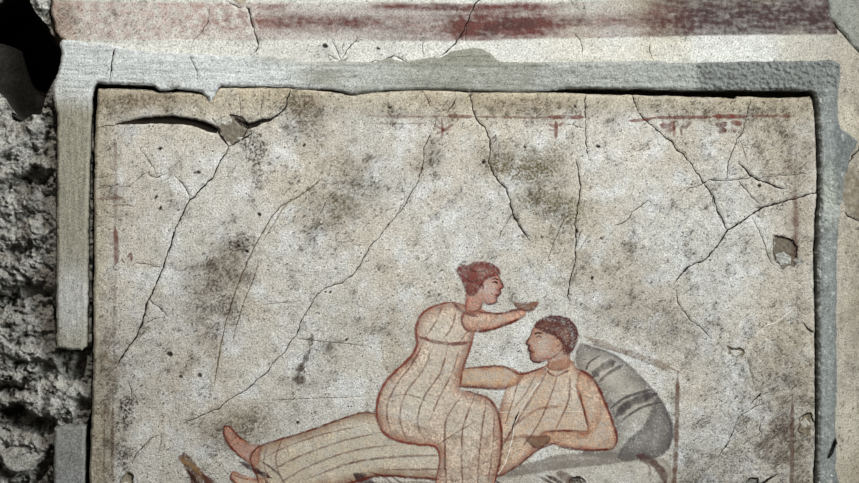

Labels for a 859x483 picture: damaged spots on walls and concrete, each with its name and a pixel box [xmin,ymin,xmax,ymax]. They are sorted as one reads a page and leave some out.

spalling [0,0,62,121]
crack [97,142,229,366]
spalling [212,114,267,179]
crack [185,90,530,423]
crack [449,95,608,474]
crack [632,95,819,339]
spalling [773,235,808,269]
crack [714,393,768,460]